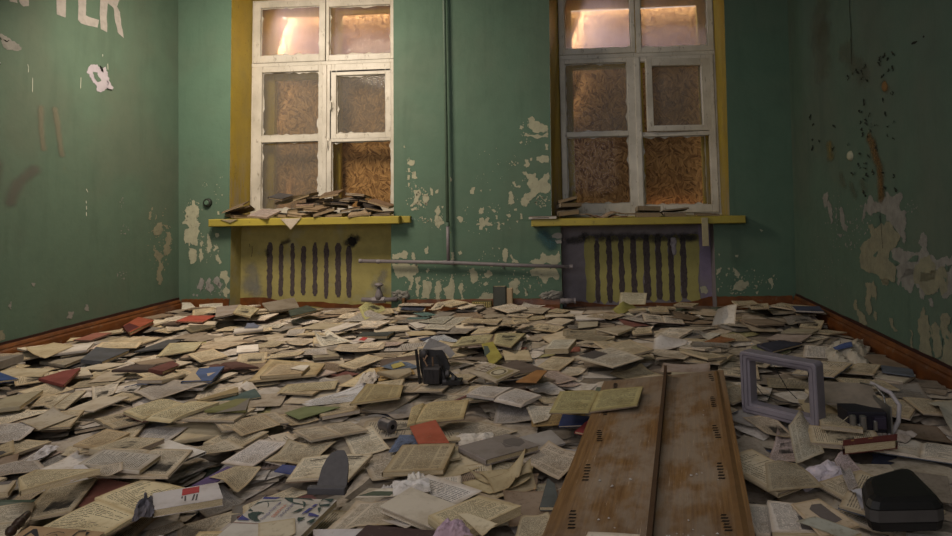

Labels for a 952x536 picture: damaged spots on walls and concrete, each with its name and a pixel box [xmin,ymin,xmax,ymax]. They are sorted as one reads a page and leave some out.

spalling [0,34,22,51]
peeling [87,64,114,92]
peeling [147,200,230,297]
peeling [406,160,444,230]
peeling [391,233,563,301]
peeling [456,116,551,234]
peeling [812,91,952,366]